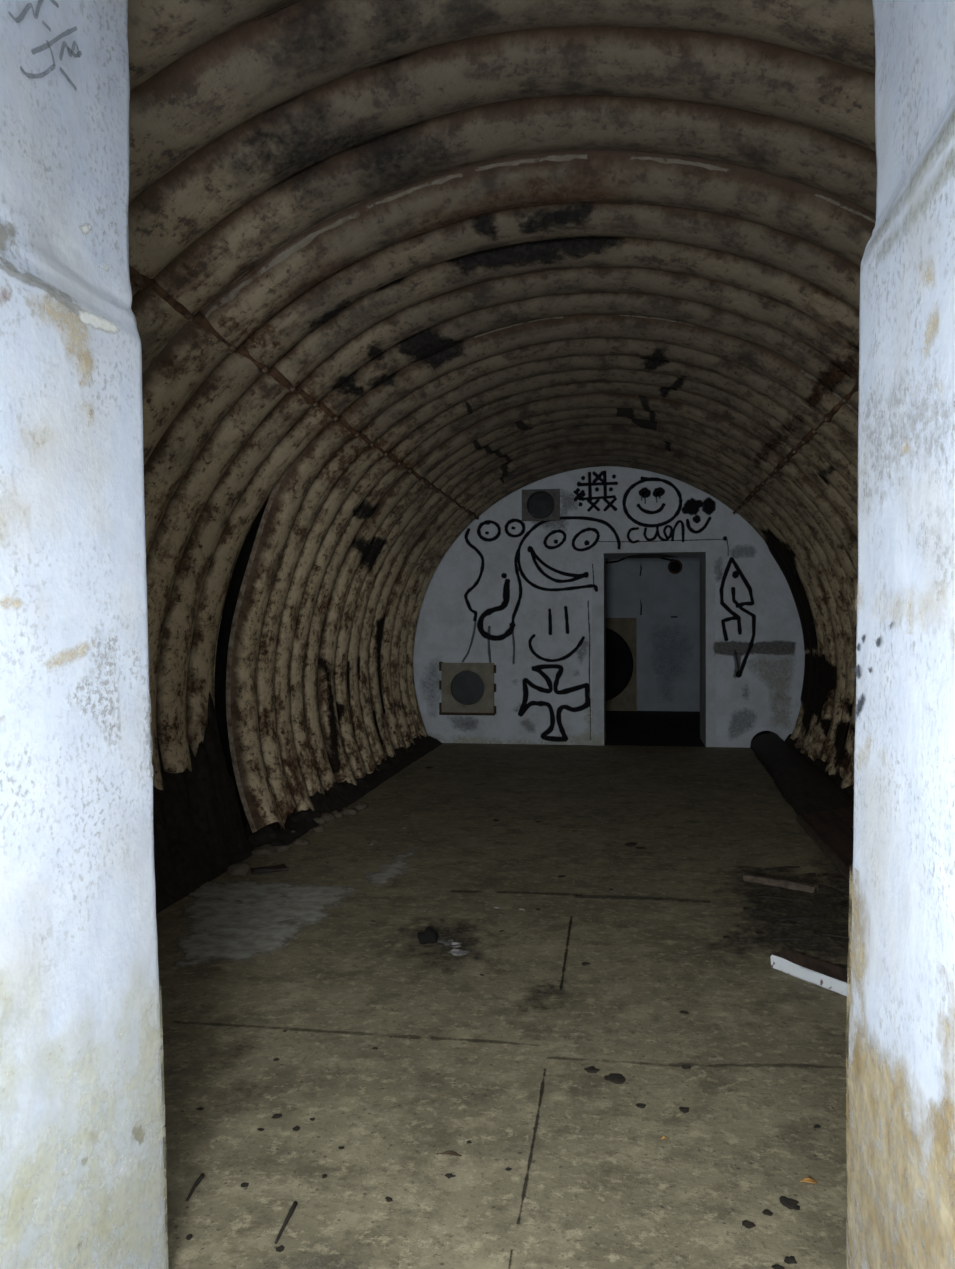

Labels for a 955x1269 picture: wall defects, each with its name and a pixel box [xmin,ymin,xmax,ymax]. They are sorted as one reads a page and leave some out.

peeling [205,154,587,318]
peeling [630,157,728,171]
leakage [823,863,864,1010]
leakage [846,1032,955,1269]